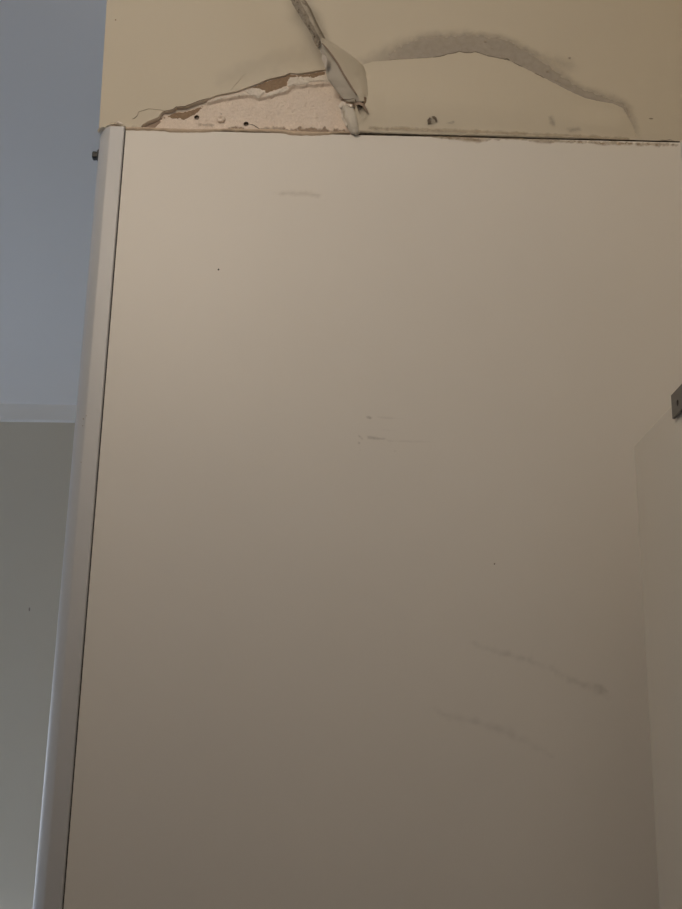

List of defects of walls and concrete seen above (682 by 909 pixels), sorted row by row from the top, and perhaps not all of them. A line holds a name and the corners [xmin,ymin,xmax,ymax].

flaking render [145,0,368,135]
crack [359,134,680,142]